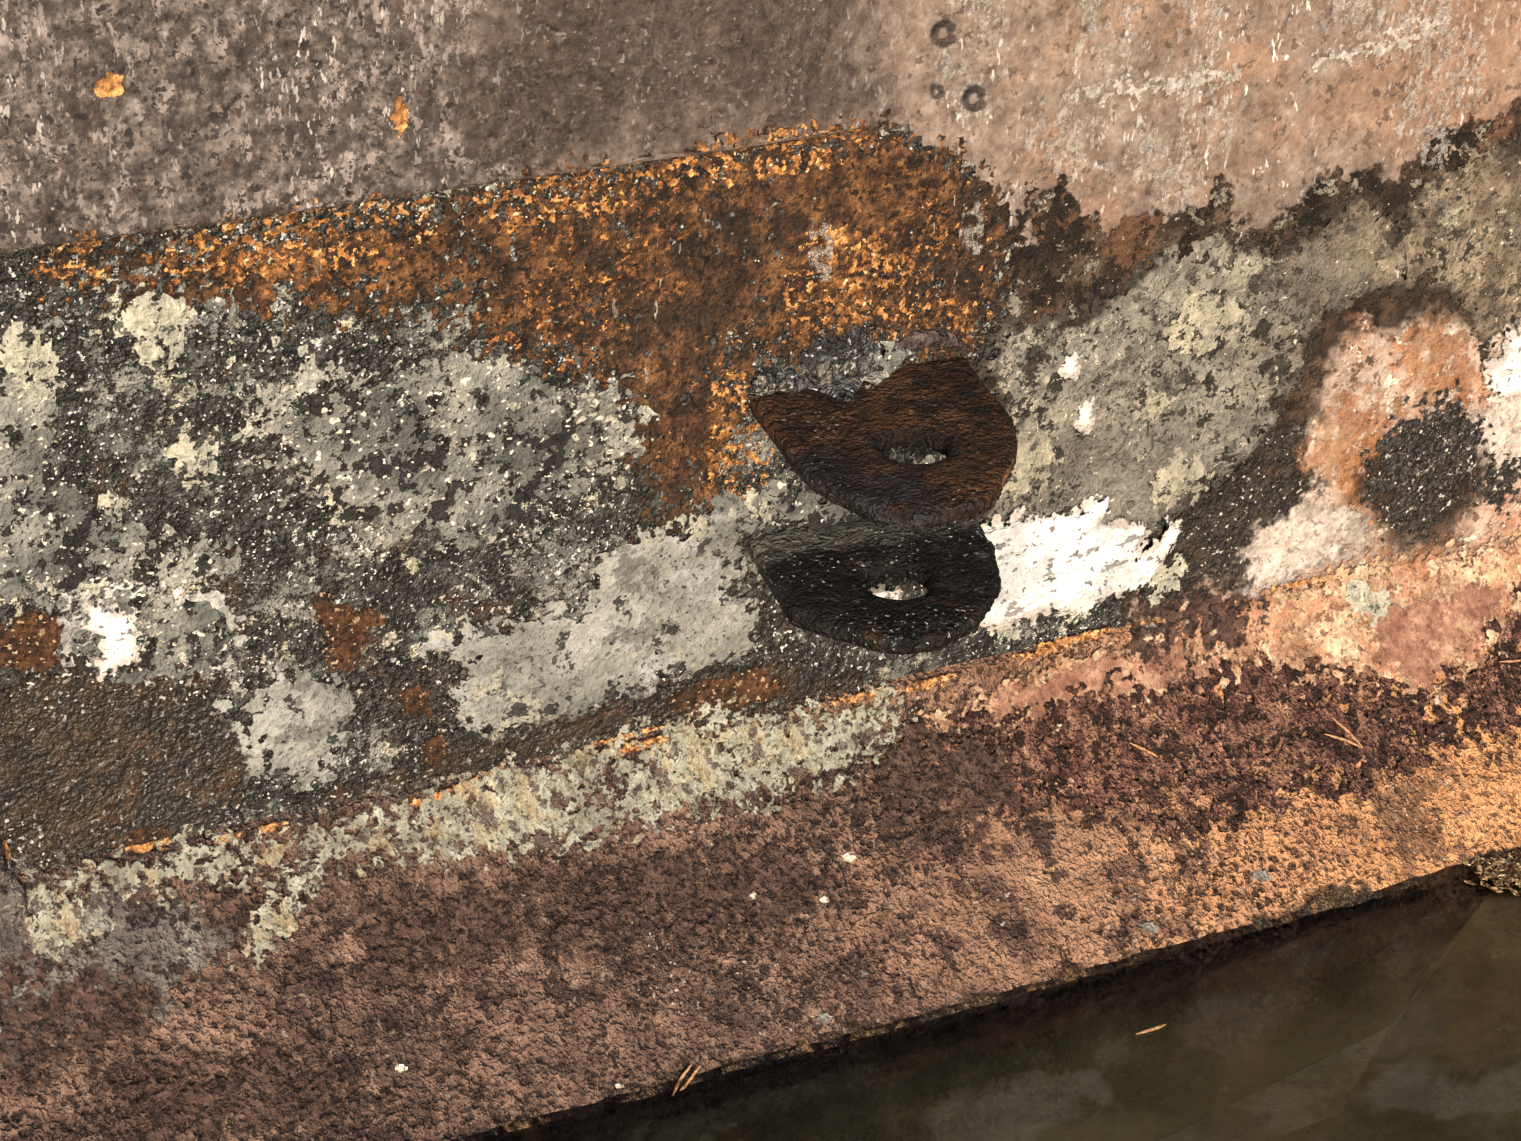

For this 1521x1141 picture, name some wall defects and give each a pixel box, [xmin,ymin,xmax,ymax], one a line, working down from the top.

corrosion [30,104,1039,544]
leakage [999,96,1521,329]
leakage [0,569,393,1141]
leakage [348,650,473,751]
leakage [347,820,834,1009]
leakage [850,273,1521,873]